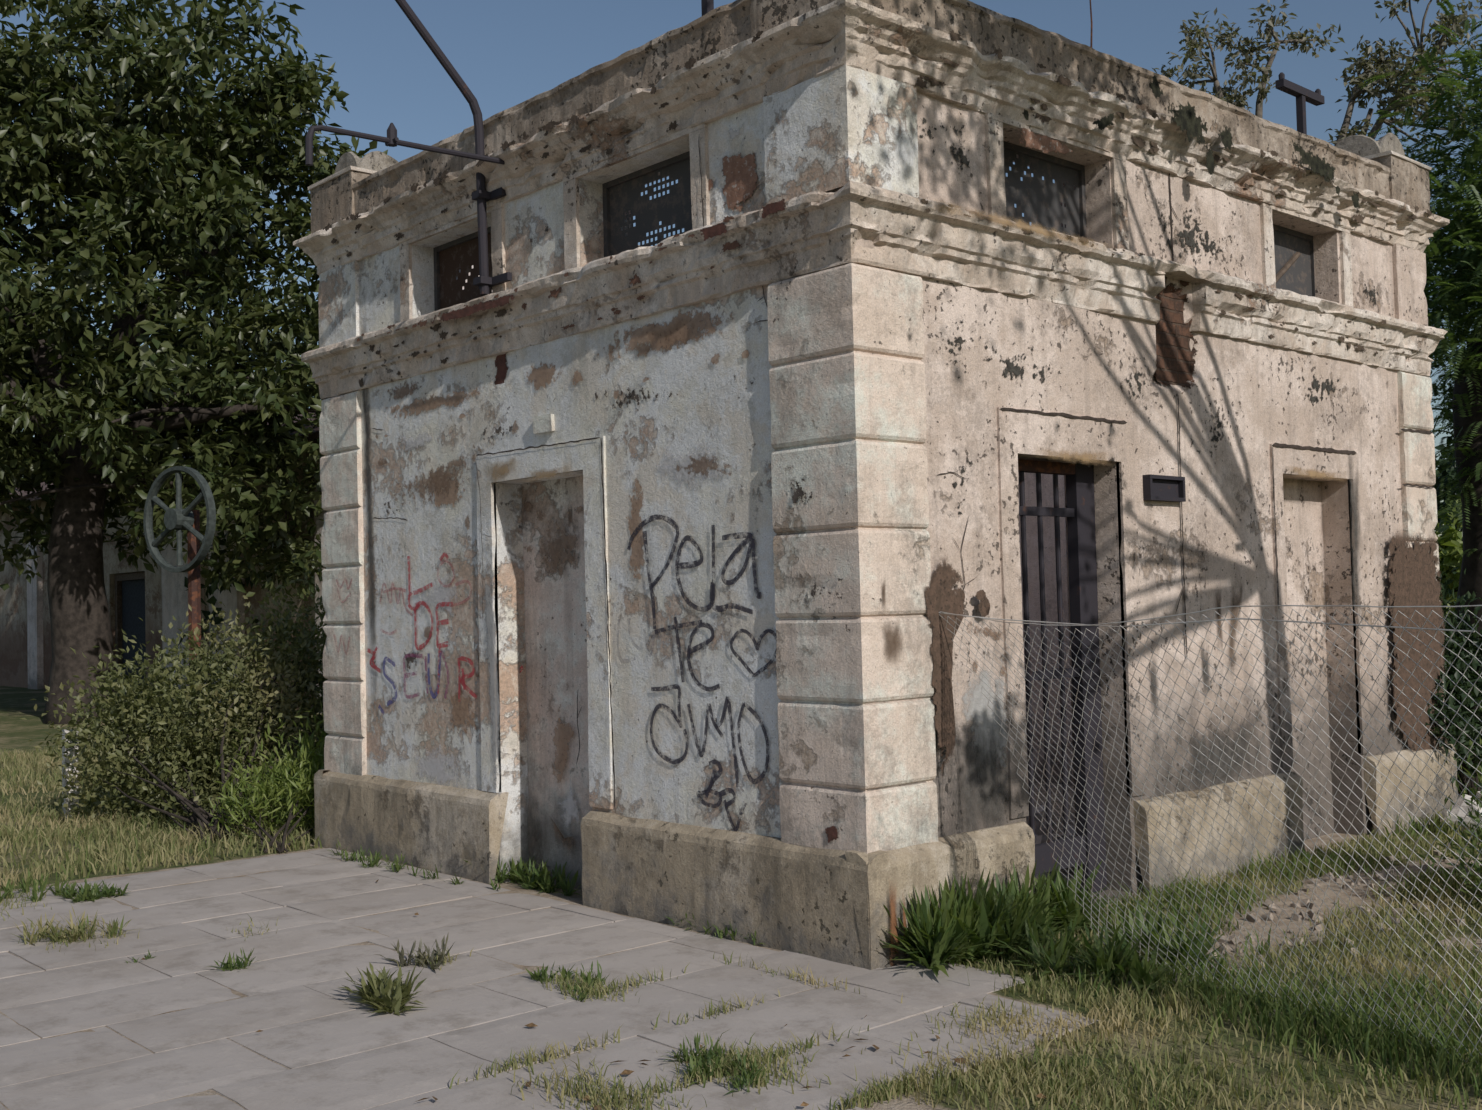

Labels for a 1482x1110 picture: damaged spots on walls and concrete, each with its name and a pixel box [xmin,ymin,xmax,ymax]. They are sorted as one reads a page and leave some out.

spalling [629,153,786,301]
flaking render [1112,205,1232,270]
peeling [357,288,527,419]
peeling [526,363,583,390]
peeling [595,377,678,411]
peeling [597,307,733,361]
spalling [1122,276,1198,419]
flaking render [1288,374,1354,406]
flaking render [1339,284,1386,354]
peeling [384,420,518,530]